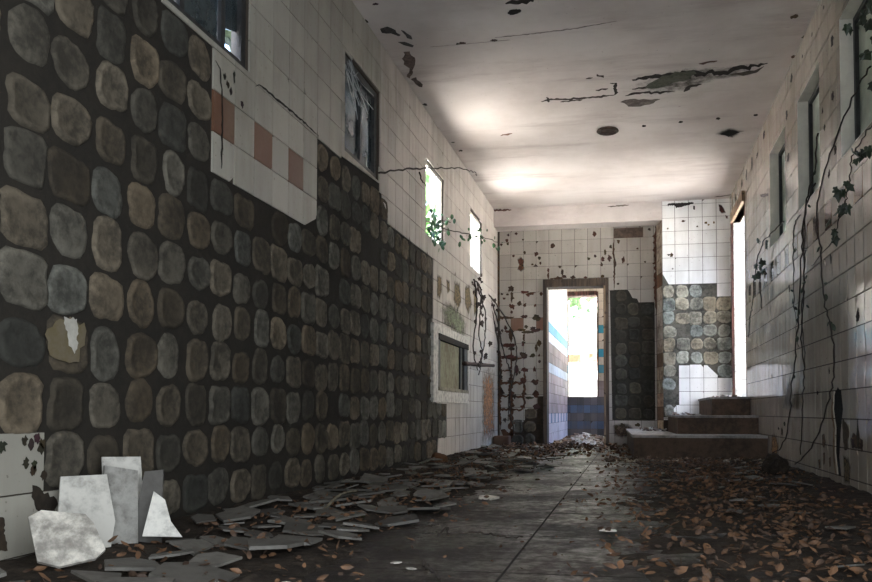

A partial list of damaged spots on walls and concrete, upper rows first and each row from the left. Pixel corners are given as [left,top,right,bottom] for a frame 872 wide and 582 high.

peeling [505,0,534,15]
crack [541,61,768,102]
spalling [512,251,587,279]
peeling [493,286,543,445]
peeling [610,274,732,435]